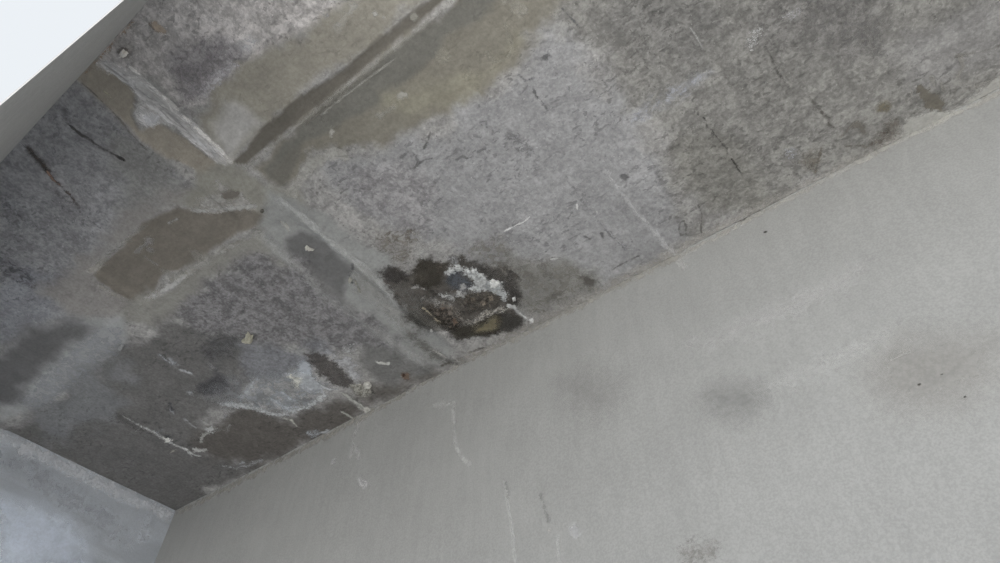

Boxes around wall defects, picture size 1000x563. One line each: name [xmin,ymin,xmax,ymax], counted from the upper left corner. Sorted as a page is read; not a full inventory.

crack [62,87,143,161]
spalling [455,289,502,311]
damp [377,229,596,366]
damp [188,344,371,438]